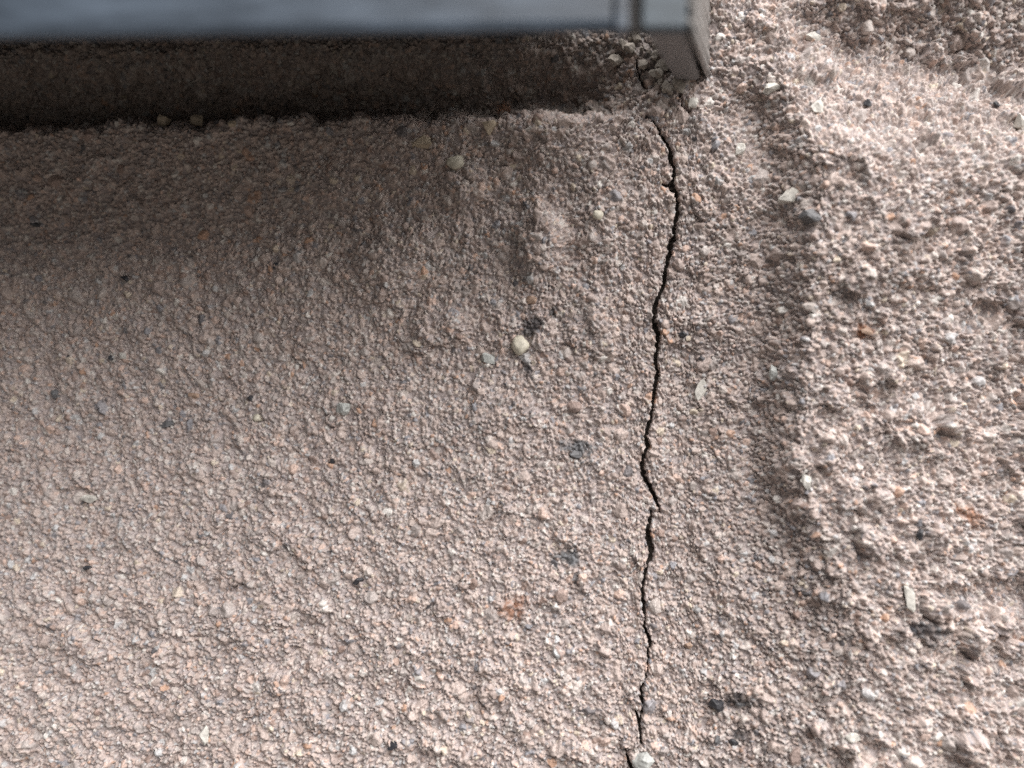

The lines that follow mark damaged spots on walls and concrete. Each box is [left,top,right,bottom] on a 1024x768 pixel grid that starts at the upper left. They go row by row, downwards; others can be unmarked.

crack [625,117,680,768]